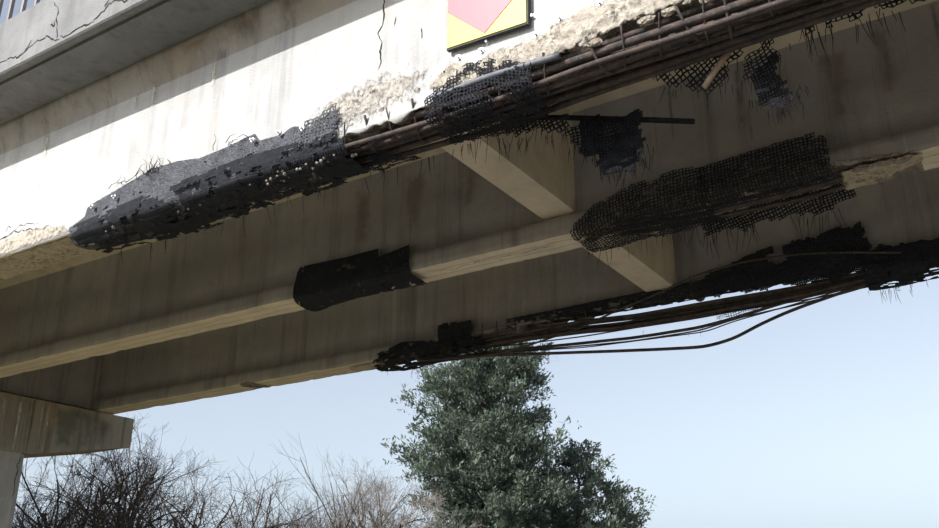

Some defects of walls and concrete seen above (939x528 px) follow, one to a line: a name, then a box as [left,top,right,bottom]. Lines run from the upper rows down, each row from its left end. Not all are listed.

crack [1,0,127,62]
crack [377,1,396,68]
spalling [311,0,714,126]
peeling [833,153,922,190]